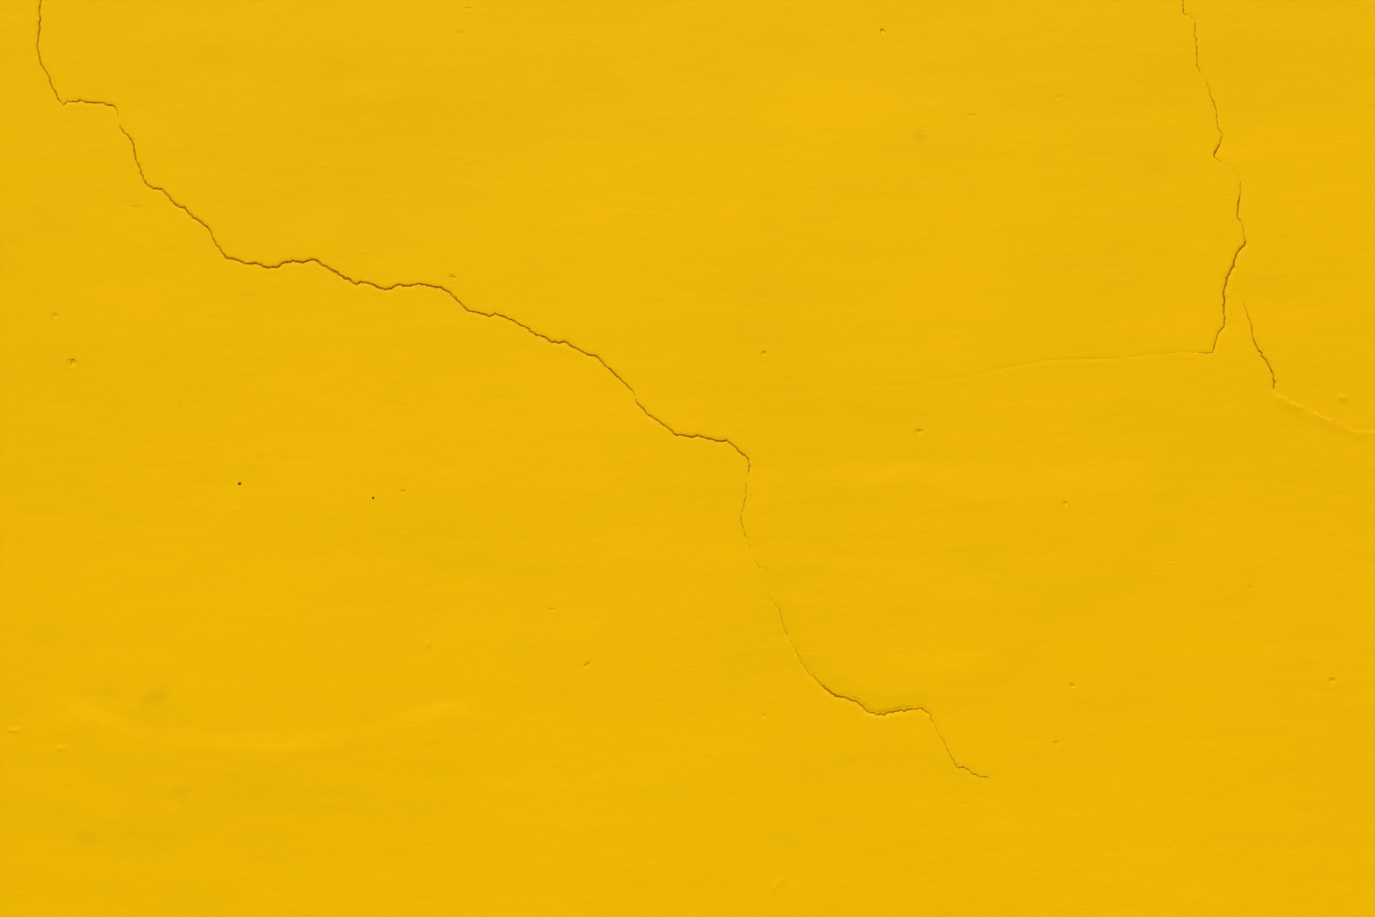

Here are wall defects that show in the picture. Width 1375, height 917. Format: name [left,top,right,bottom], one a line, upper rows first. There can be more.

crack [31,0,998,784]